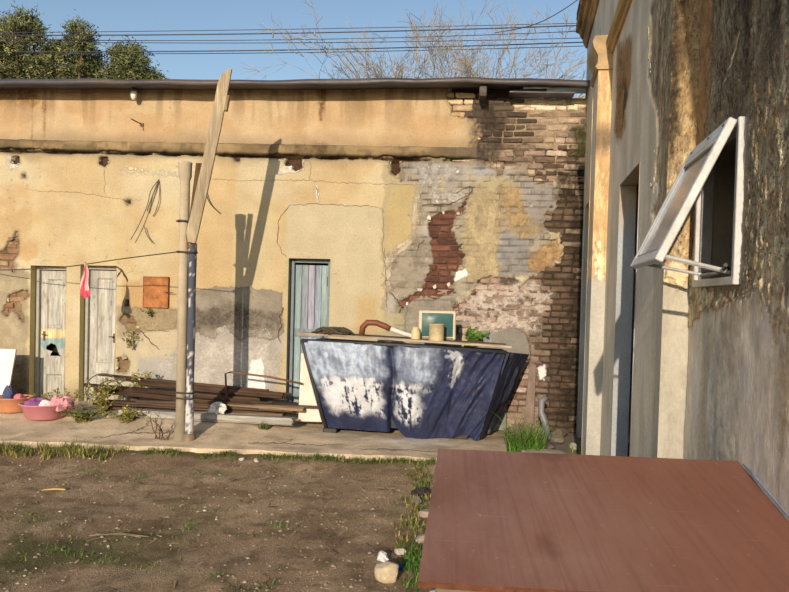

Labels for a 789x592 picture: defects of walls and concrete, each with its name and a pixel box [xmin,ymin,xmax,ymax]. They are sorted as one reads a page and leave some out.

damp [615,37,631,138]
damp [668,0,686,133]
spalling [277,156,304,175]
spalling [0,232,20,272]
spalling [3,290,30,322]
spalling [120,300,140,335]
spalling [381,92,587,433]
peeling [666,243,737,328]
peeling [750,254,789,344]